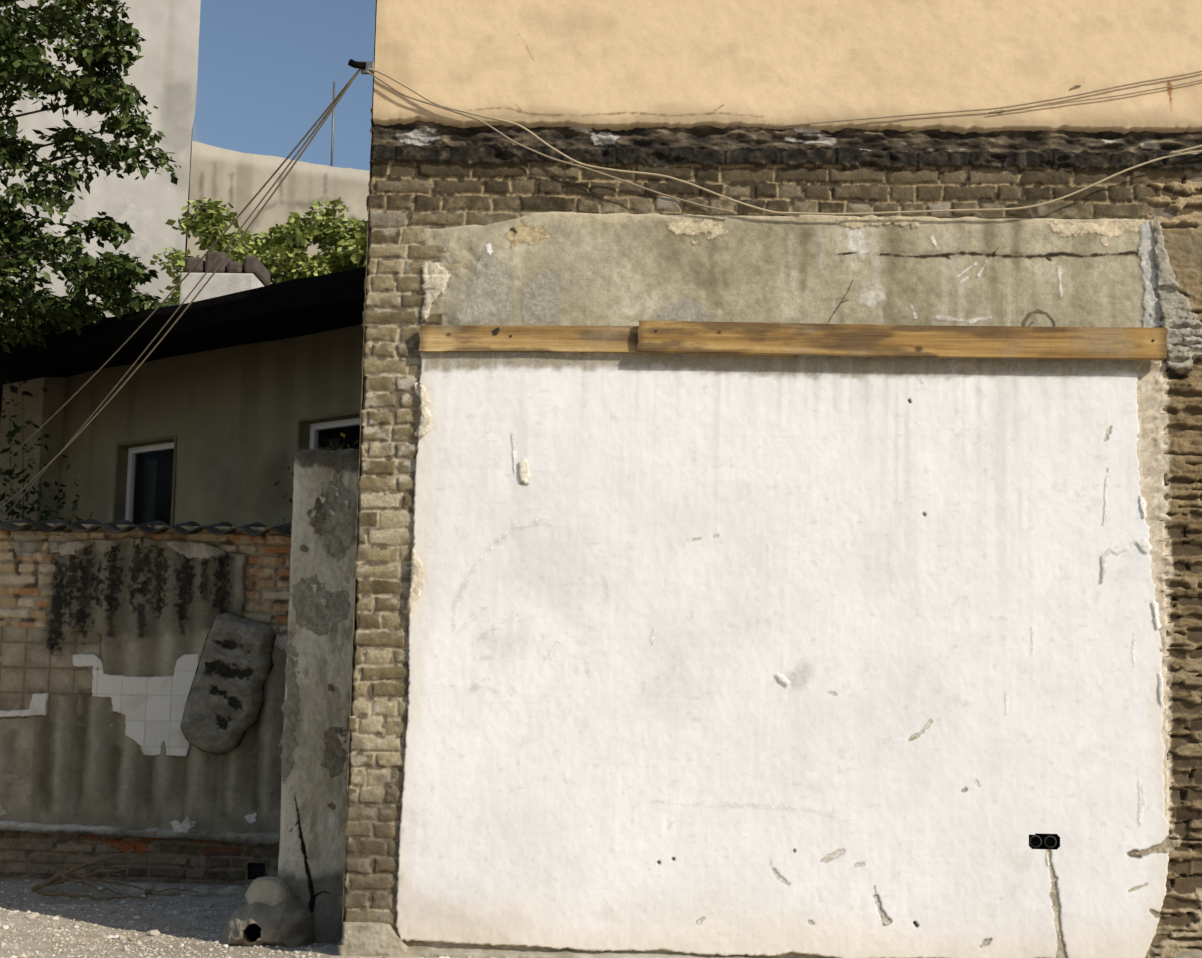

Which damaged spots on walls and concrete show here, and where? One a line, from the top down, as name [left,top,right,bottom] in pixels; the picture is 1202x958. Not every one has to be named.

spalling [506,219,552,250]
spalling [665,217,729,244]
crack [828,251,1139,322]
water stain [170,817,195,833]
water stain [245,799,257,824]
crack [289,793,329,913]